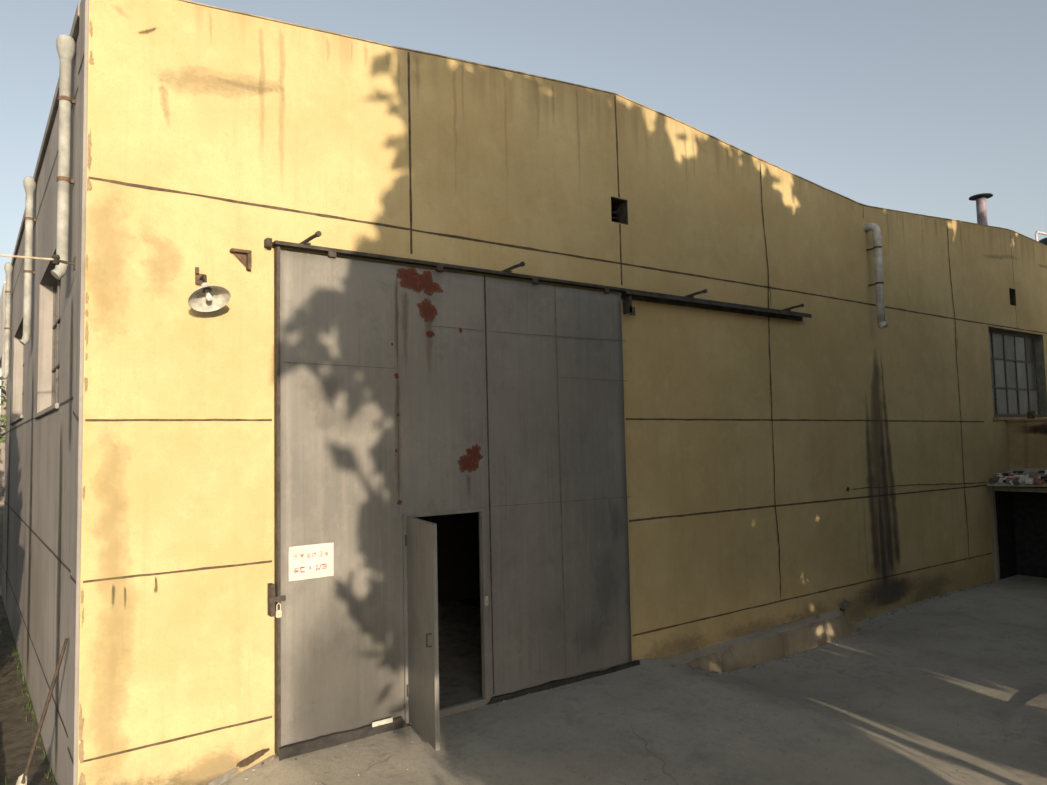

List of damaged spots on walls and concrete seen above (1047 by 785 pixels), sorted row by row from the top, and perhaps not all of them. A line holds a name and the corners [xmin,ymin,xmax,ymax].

corrosion [397,267,443,337]
corrosion [458,444,483,472]
damp [867,364,907,603]